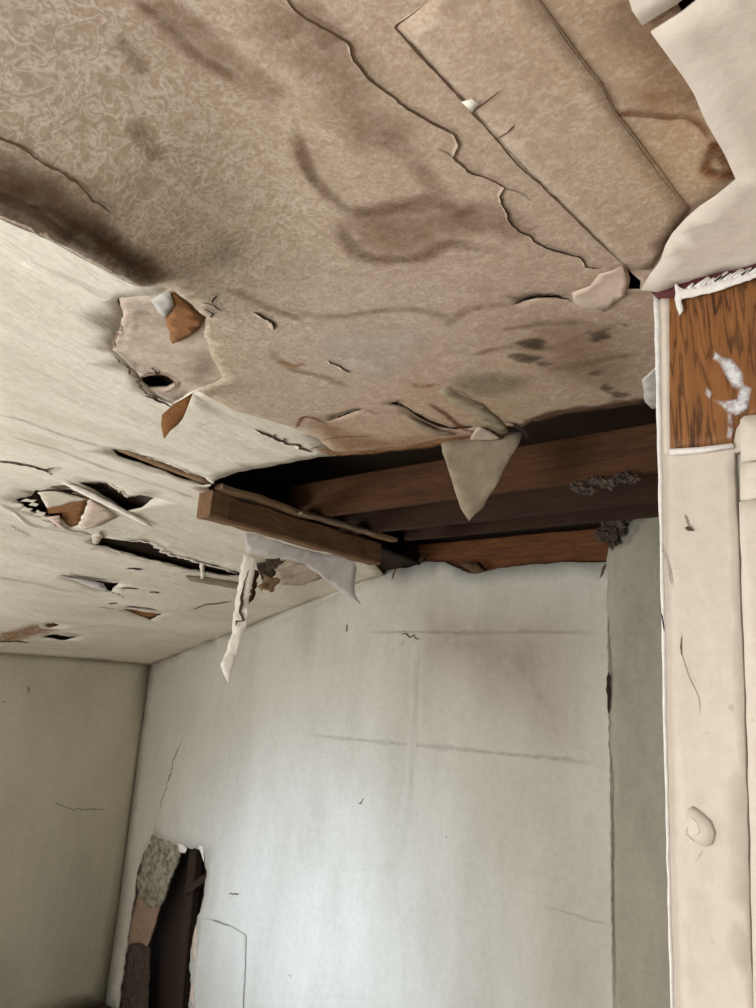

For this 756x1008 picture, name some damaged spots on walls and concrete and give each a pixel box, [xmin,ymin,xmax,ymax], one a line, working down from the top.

crack [285,0,597,269]
leakage [0,171,157,283]
peeling [675,267,756,316]
flaking render [109,288,222,407]
leakage [513,339,546,366]
crack [253,430,323,453]
leakage [296,405,470,455]
peeling [10,491,118,544]
spalling [121,834,207,1008]